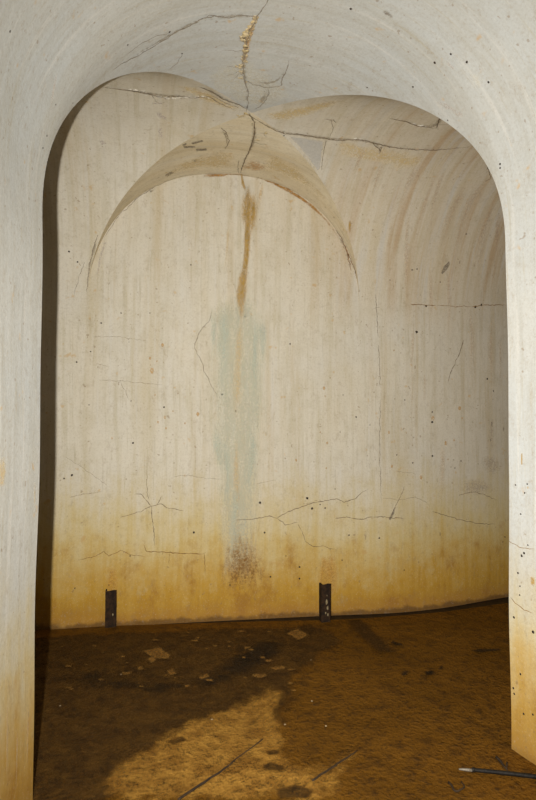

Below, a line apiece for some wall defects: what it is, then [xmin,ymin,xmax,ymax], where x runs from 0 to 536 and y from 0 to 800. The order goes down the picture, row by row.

efflorescence [235,15,259,83]
crack [105,0,465,170]
corrosion [182,156,303,311]
corrosion [265,180,321,215]
crack [81,470,205,564]
crack [240,411,404,549]